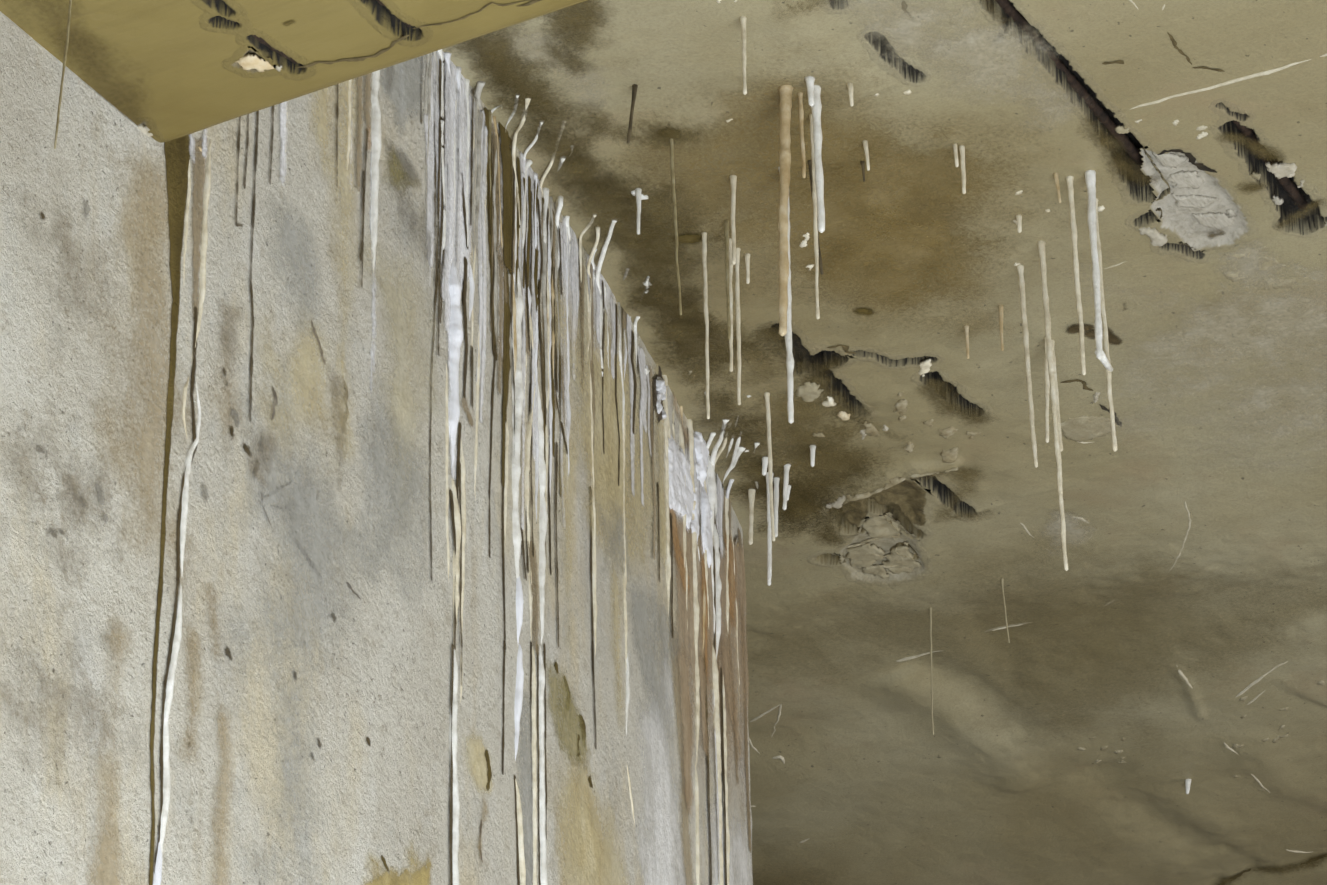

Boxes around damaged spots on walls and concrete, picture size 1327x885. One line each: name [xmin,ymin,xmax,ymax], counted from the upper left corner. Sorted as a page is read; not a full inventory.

leakage [236,101,288,422]
leakage [317,56,427,537]
leakage [463,0,1000,885]
spalling [811,0,857,15]
spalling [755,319,993,589]
crack [827,345,945,377]
spalling [856,26,934,87]
leakage [1095,349,1113,372]
spalling [967,0,1327,264]
leakage [1147,297,1327,437]
leakage [445,364,466,885]
corrosion [670,508,749,809]